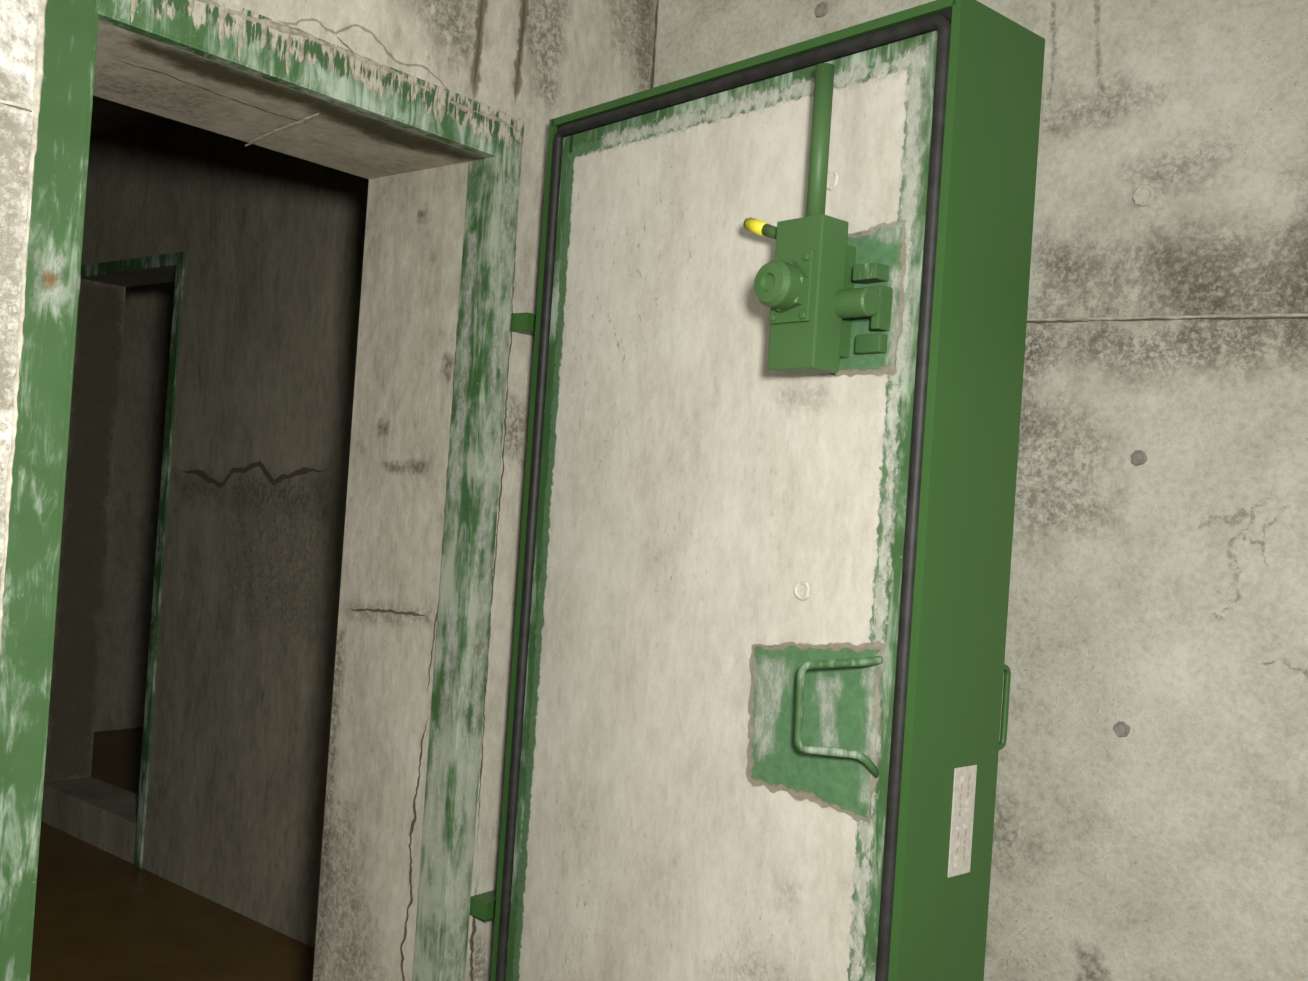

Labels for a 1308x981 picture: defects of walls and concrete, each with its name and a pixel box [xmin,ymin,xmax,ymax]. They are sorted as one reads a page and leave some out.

water stain [0,73,25,99]
peeling [131,0,525,149]
water stain [0,115,28,409]
water stain [1075,331,1260,359]
crack [184,461,322,507]
crack [478,248,523,827]
crack [400,722,427,981]
crack [470,893,484,981]